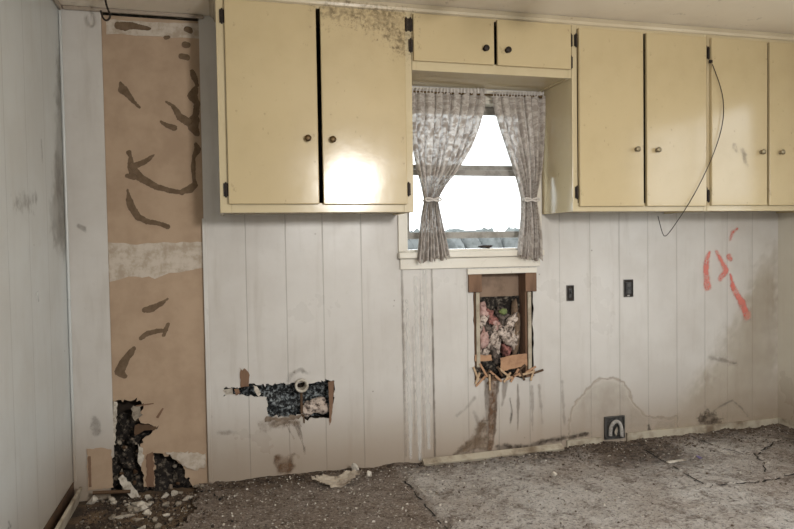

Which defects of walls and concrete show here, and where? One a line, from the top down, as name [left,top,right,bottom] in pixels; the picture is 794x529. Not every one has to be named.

spalling [467,267,544,391]
spalling [87,401,206,498]
spalling [223,368,335,425]
damp [462,378,528,452]
crack [644,437,794,487]